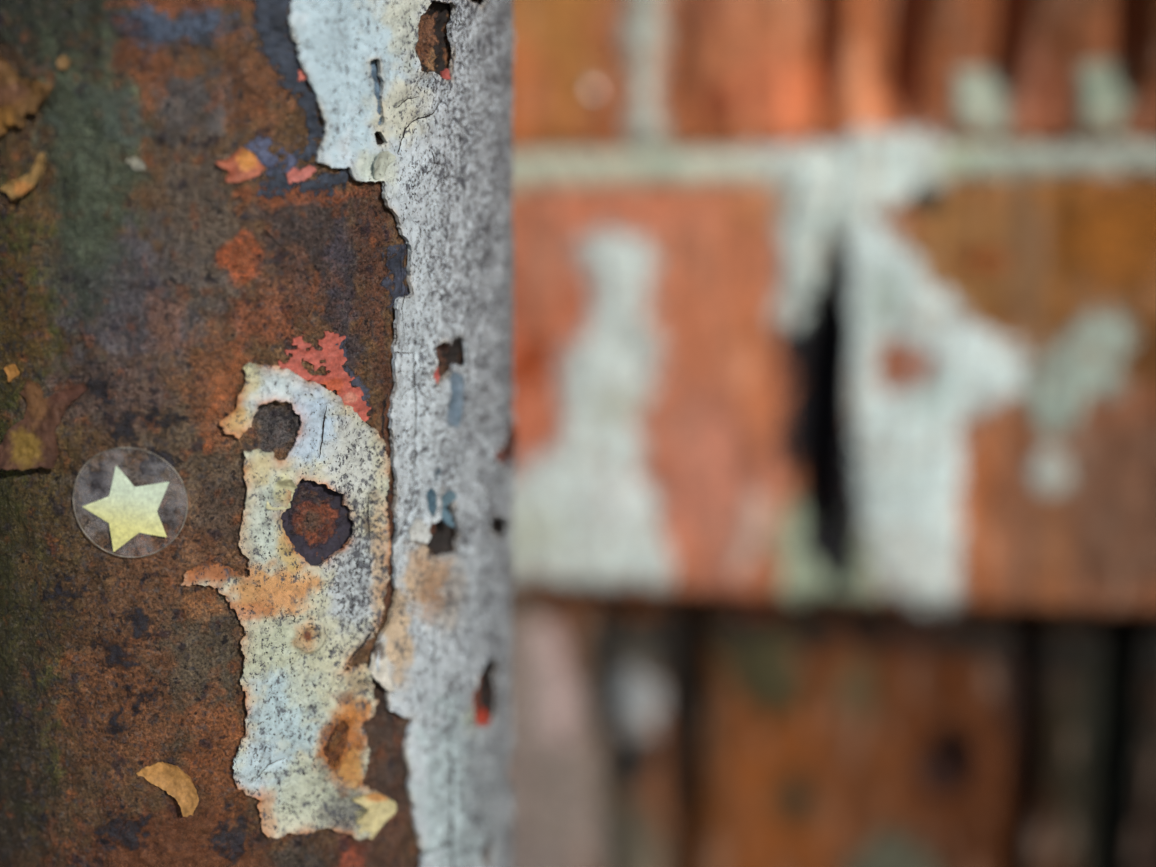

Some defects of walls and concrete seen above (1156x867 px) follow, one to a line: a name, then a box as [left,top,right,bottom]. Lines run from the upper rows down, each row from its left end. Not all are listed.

peeling [0,55,55,137]
peeling [56,55,71,69]
peeling [0,152,45,200]
peeling [180,0,517,867]